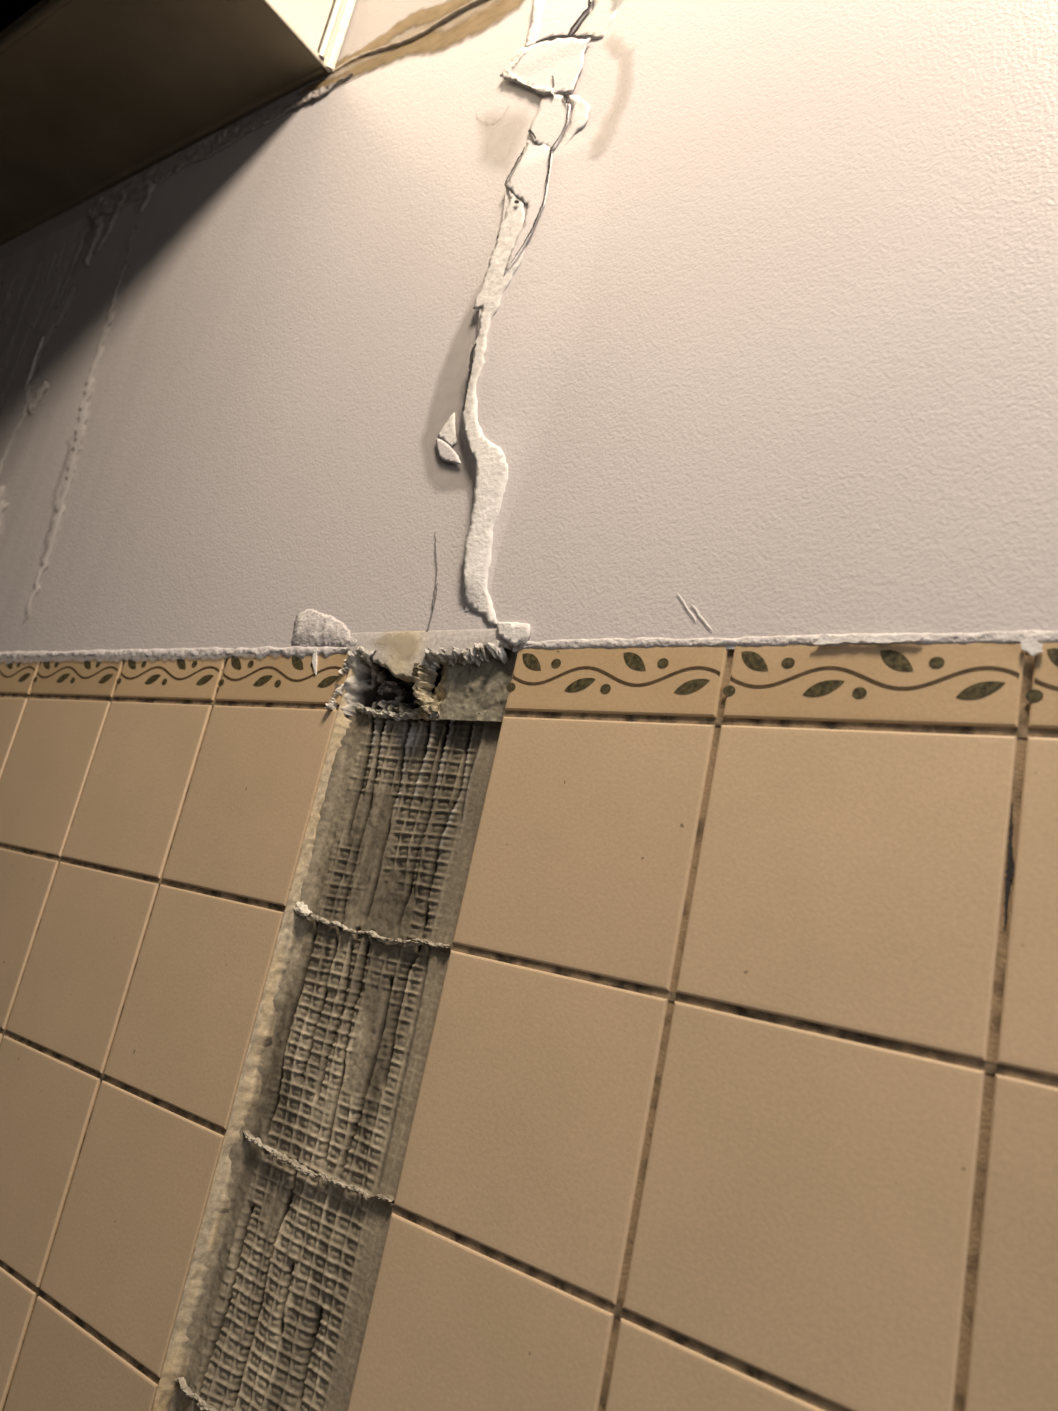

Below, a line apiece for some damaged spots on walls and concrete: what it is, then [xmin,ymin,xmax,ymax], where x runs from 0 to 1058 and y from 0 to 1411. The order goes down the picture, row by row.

crack [536,0,592,43]
crack [496,75,569,262]
water stain [0,283,77,533]
water stain [23,227,137,621]
crack [462,343,477,412]
peeling [0,0,1058,724]